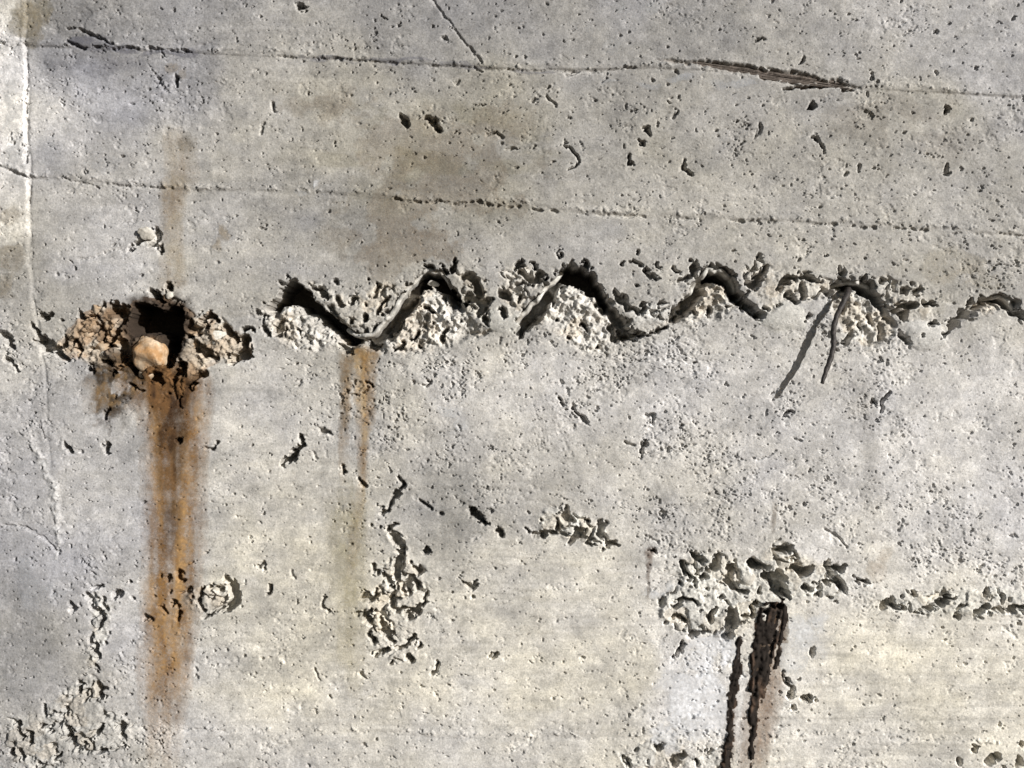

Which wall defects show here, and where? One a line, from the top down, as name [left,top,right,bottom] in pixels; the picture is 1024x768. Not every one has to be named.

crack [64,26,193,54]
crack [276,0,637,76]
spalling [30,258,767,393]
spalling [824,273,899,352]
spalling [940,292,1024,340]
corrosion [341,348,376,484]
corrosion [94,357,201,699]
hole [655,541,871,659]
water stain [652,596,824,768]